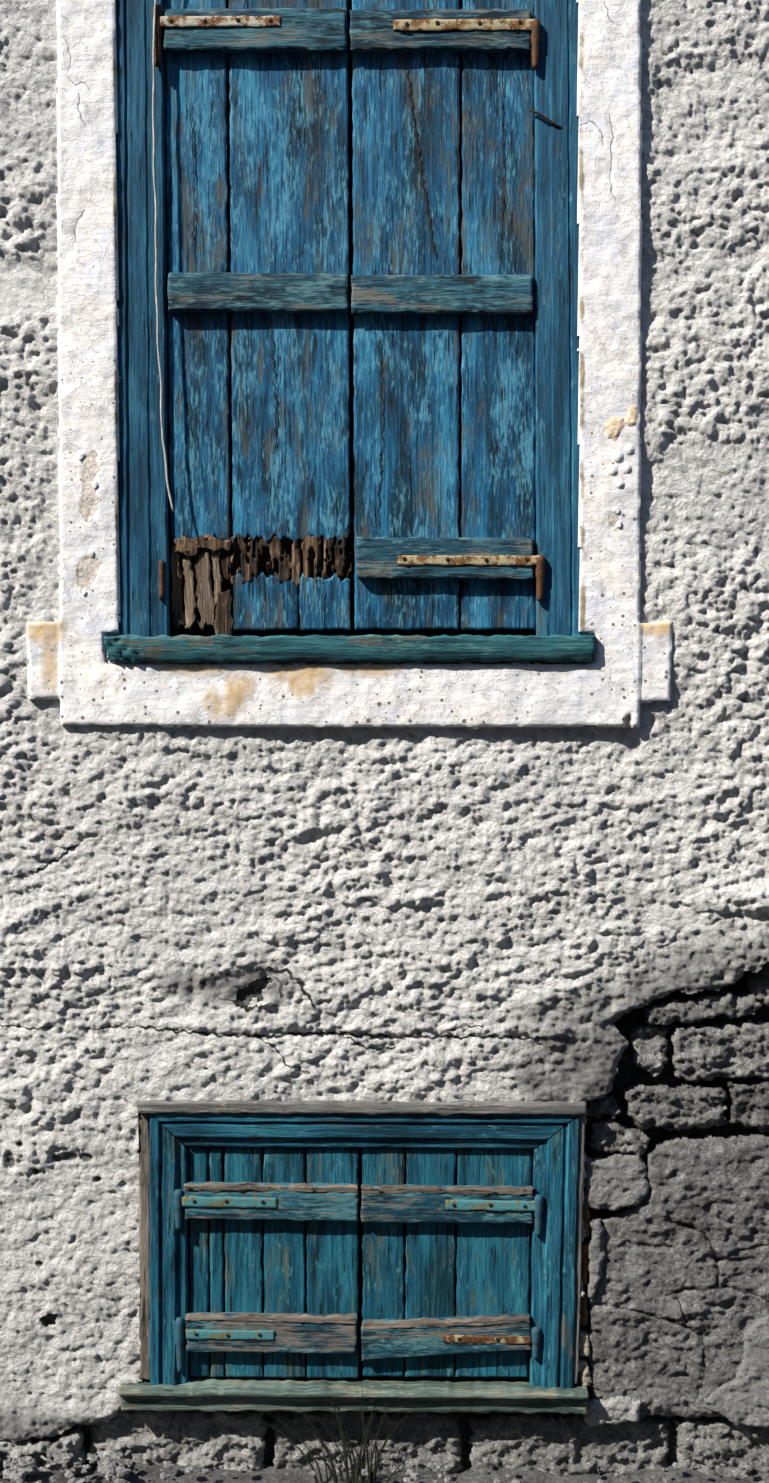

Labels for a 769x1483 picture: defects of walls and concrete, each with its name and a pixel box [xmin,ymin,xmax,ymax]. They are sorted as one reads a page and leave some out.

flaking render [173,966,316,1012]
flaking render [566,961,769,1431]